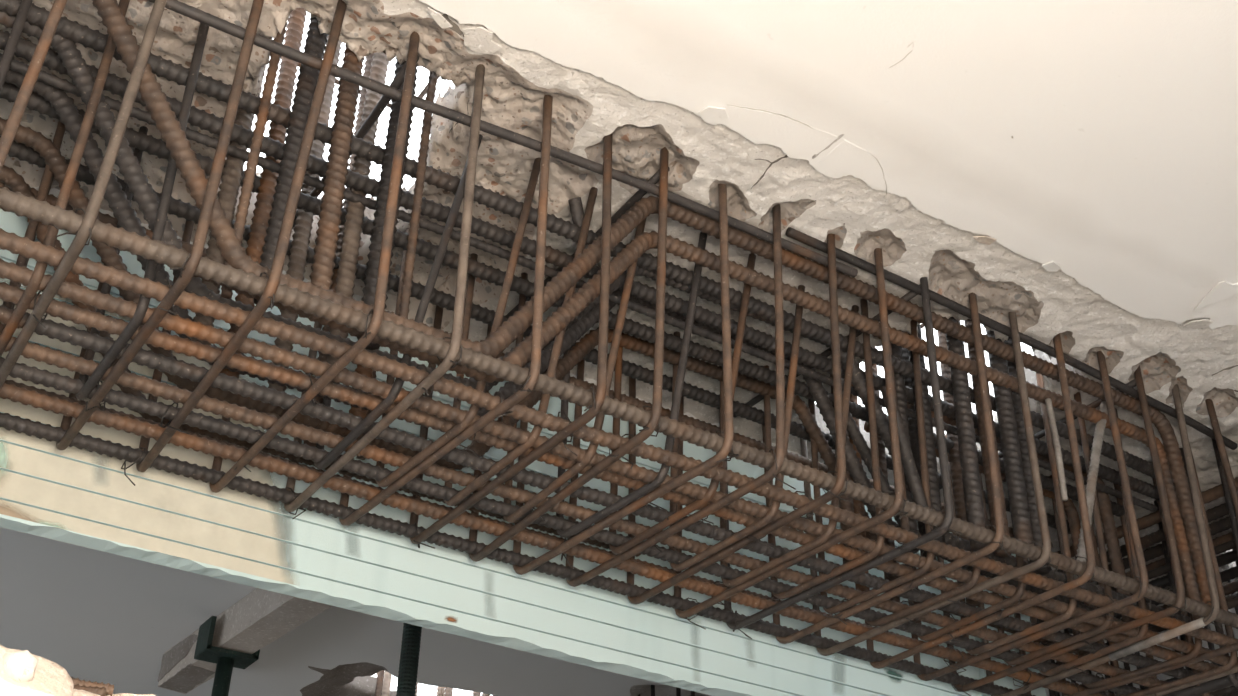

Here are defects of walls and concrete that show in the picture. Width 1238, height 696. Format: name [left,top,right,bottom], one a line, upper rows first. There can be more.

spalling [32,0,108,35]
spalling [75,43,131,81]
spalling [4,155,60,190]
spalling [0,98,87,166]
crack [731,105,844,189]
damp [0,299,87,331]
spalling [117,0,1238,606]
damp [1,328,145,419]
damp [110,334,263,432]
damp [0,398,292,584]
spalling [300,662,397,696]
spalling [630,685,711,696]